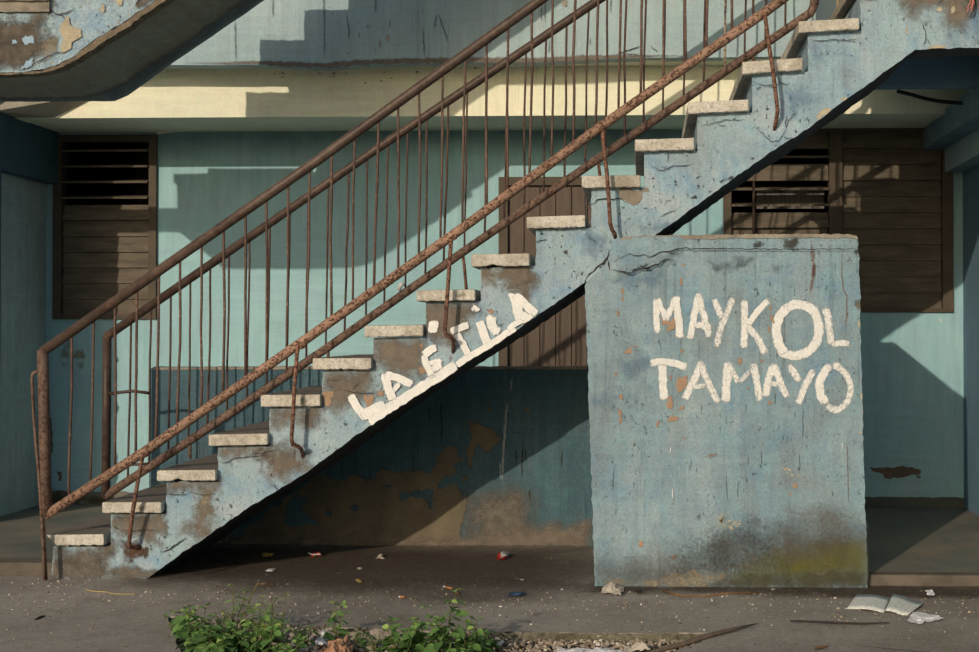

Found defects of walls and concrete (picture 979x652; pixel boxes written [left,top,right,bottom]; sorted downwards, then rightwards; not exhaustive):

peeling [12,16,82,69]
crack [584,189,856,280]
peeling [241,422,501,546]
peeling [870,465,921,479]
water stain [596,517,865,588]